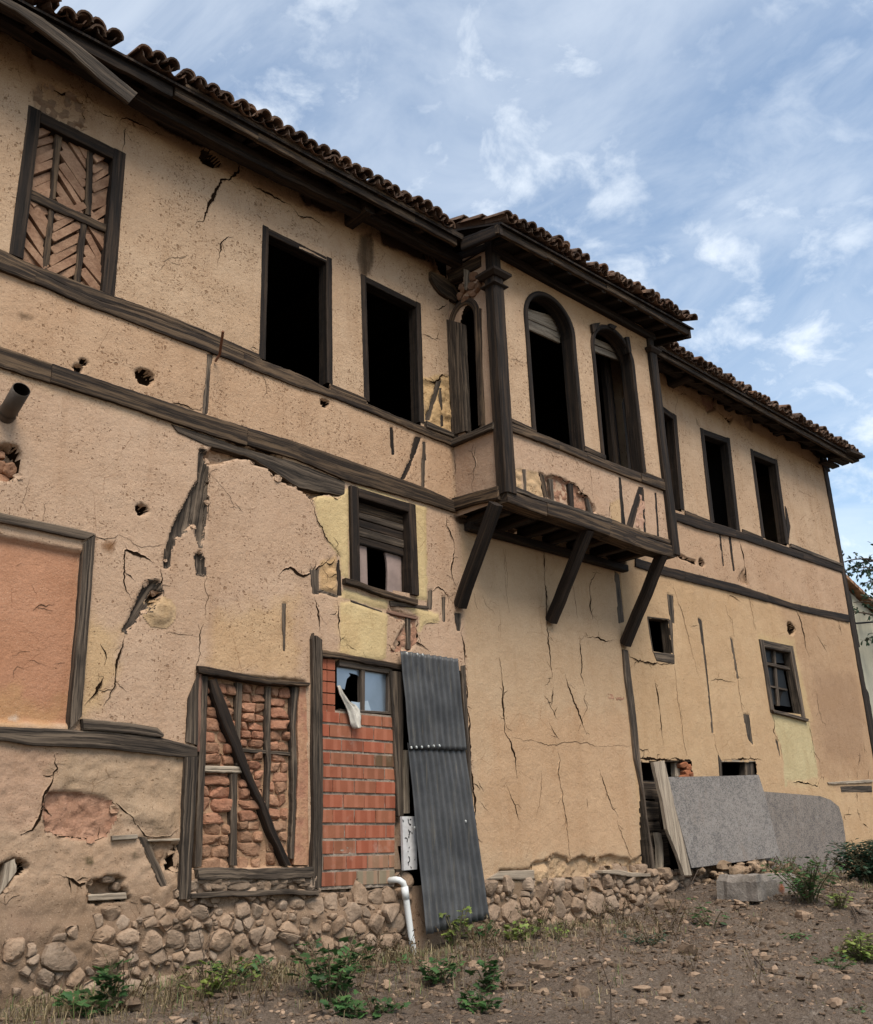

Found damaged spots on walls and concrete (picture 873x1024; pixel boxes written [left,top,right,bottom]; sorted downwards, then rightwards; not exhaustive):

crack [196,165,324,227]
spalling [162,444,277,576]
spalling [270,472,340,500]
spalling [542,474,594,512]
crack [85,534,165,706]
spalling [388,608,418,653]
crack [395,516,753,864]
crack [712,714,782,761]
crack [795,698,824,787]
crack [21,754,108,843]
spalling [42,792,119,844]